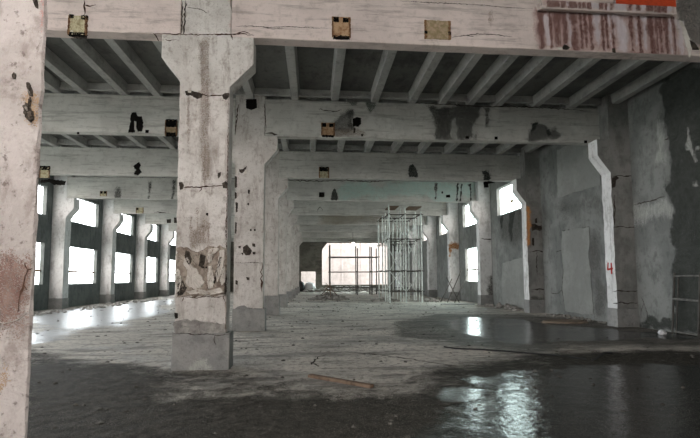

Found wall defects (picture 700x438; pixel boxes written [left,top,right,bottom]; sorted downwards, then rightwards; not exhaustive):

crack [154,0,313,41]
rust [532,0,692,55]
spalling [22,82,34,123]
spalling [128,112,149,133]
water stain [428,104,491,140]
water stain [527,120,561,142]
crack [178,94,263,303]
rust [0,248,31,344]
flaking render [175,245,238,332]